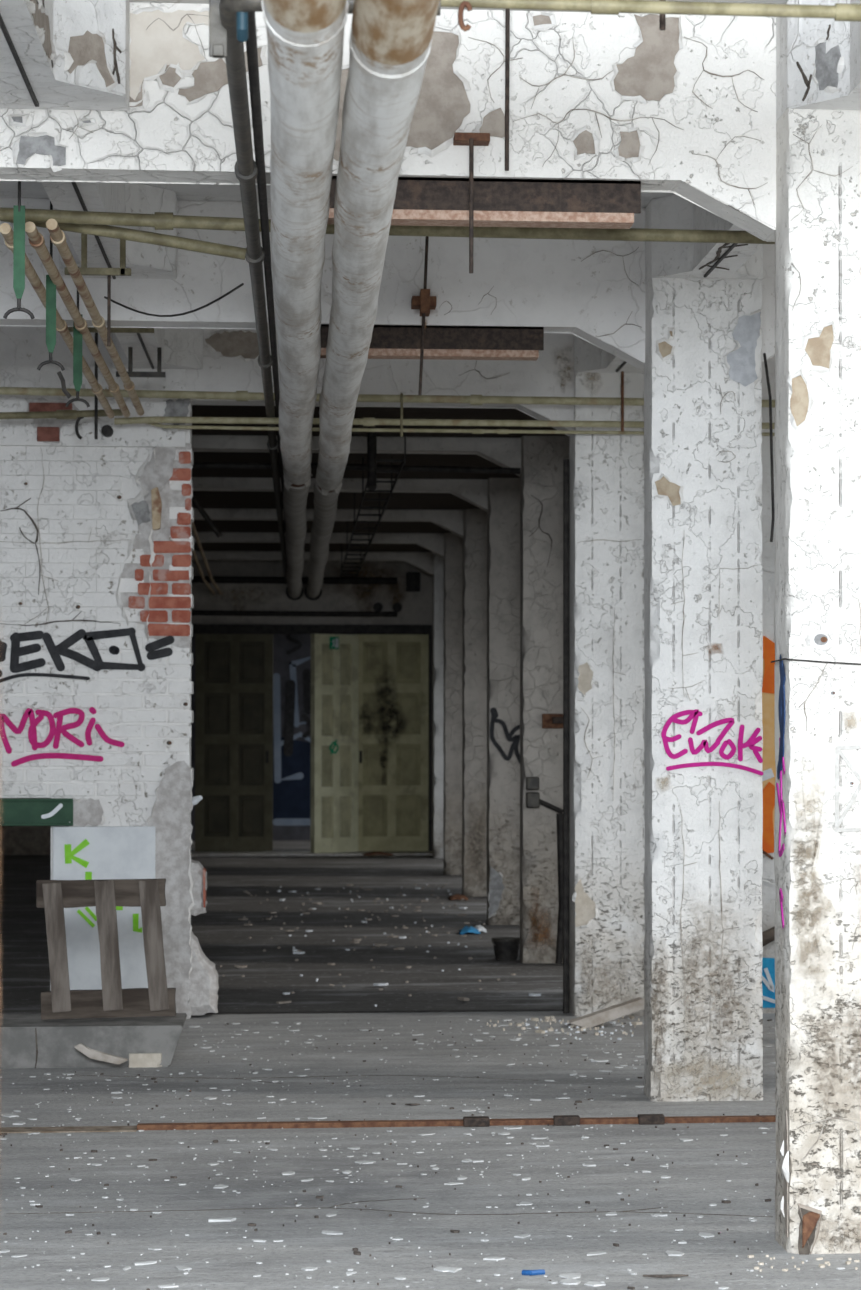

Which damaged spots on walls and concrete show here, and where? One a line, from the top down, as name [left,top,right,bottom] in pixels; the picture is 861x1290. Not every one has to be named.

peeling [25,0,228,109]
peeling [243,42,267,72]
peeling [405,29,513,158]
peeling [610,13,683,104]
crack [468,37,861,218]
peeling [723,309,763,386]
peeling [787,321,835,431]
flaking render [114,443,193,648]